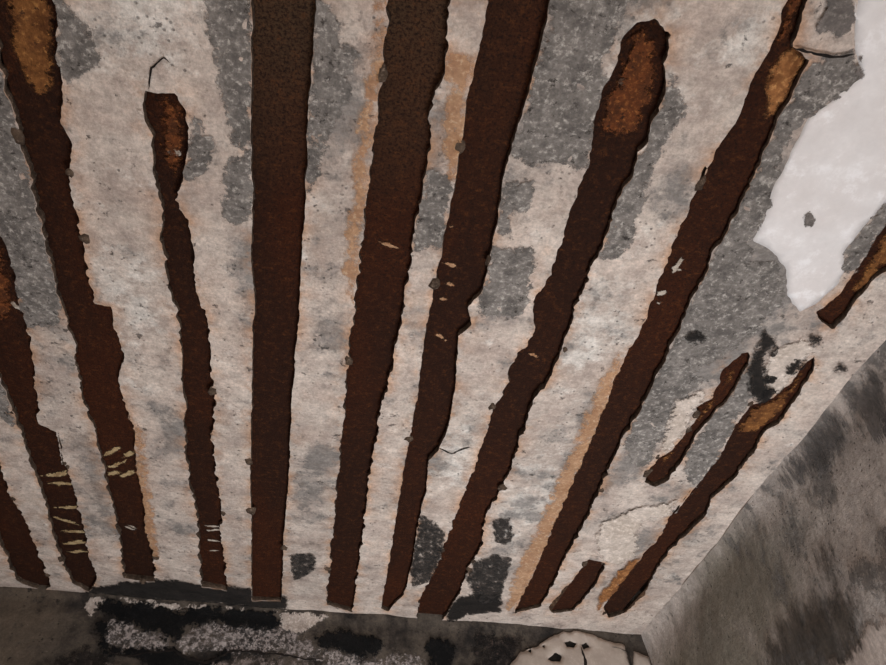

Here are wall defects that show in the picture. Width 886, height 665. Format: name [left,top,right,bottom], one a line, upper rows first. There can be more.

corrosion [341,2,387,303]
corrosion [443,52,475,180]
spalling [381,0,687,620]
flaking render [515,0,886,618]
corrosion [134,428,159,557]
corrosion [506,354,620,611]
leakage [84,596,106,617]
leakage [120,597,207,610]
leakage [105,610,421,665]
corrosion [597,559,640,610]
flaking render [828,616,886,665]